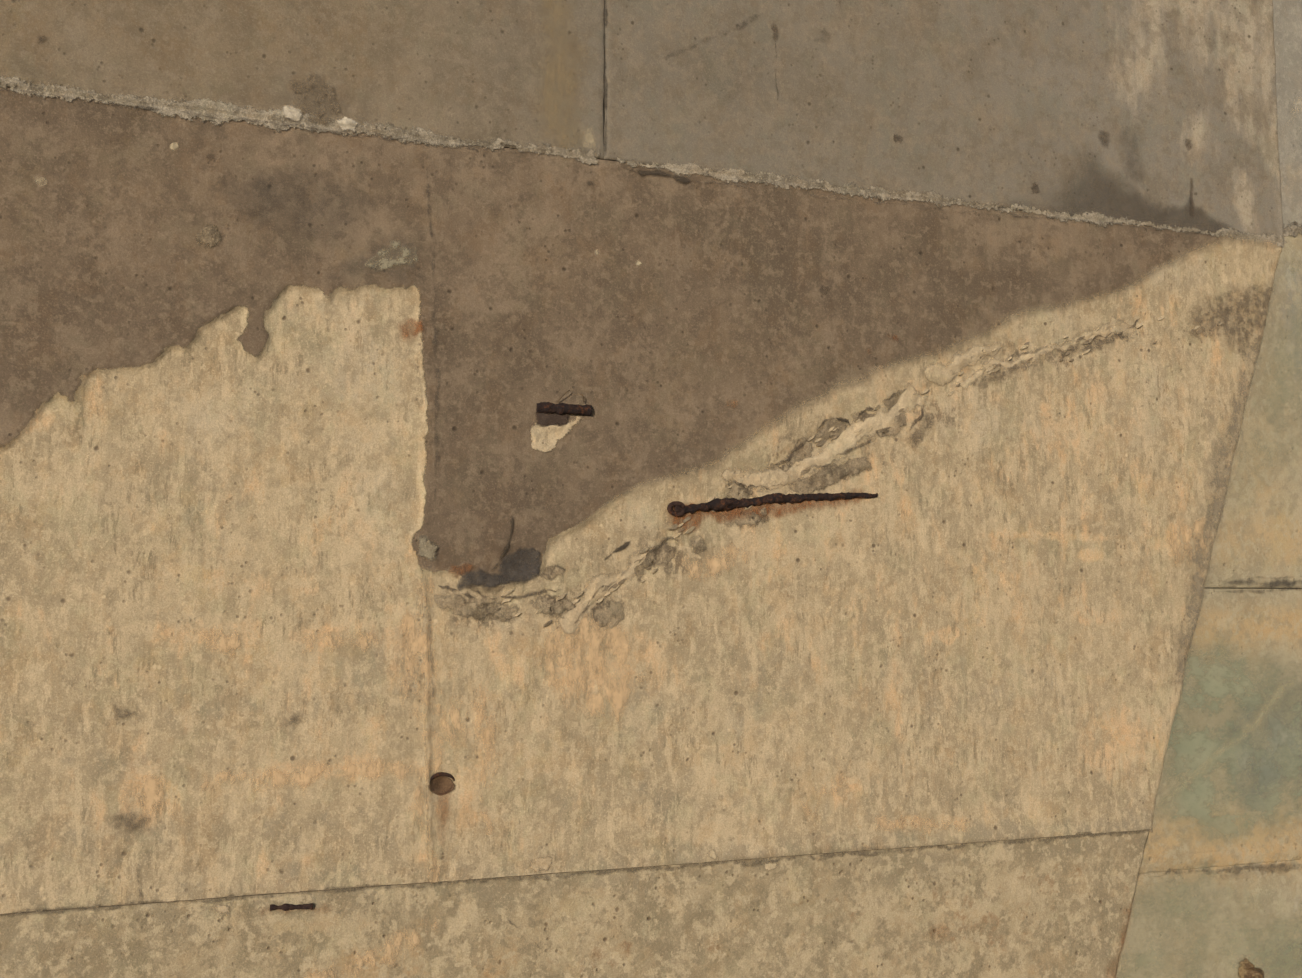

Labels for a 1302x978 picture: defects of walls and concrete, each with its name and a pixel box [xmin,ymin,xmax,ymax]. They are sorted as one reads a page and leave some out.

water stain [1076,181,1230,235]
corrosion [673,498,860,530]
spalling [0,239,1282,914]